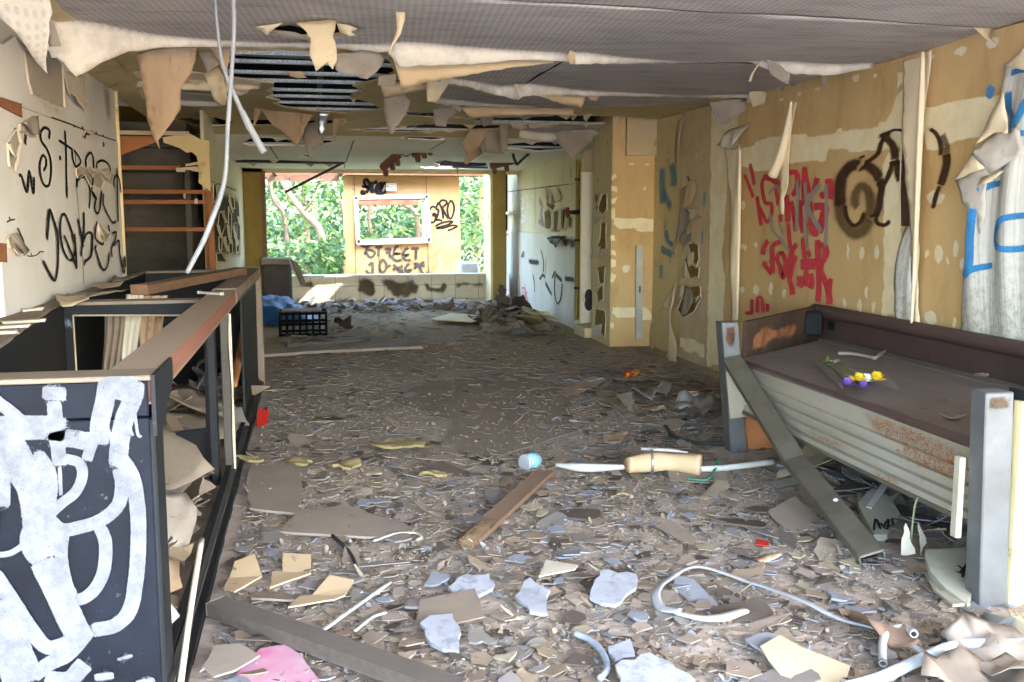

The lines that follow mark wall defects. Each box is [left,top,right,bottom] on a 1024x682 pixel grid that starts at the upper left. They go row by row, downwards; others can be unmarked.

peeling [680,105,710,367]
rust [865,413,969,485]